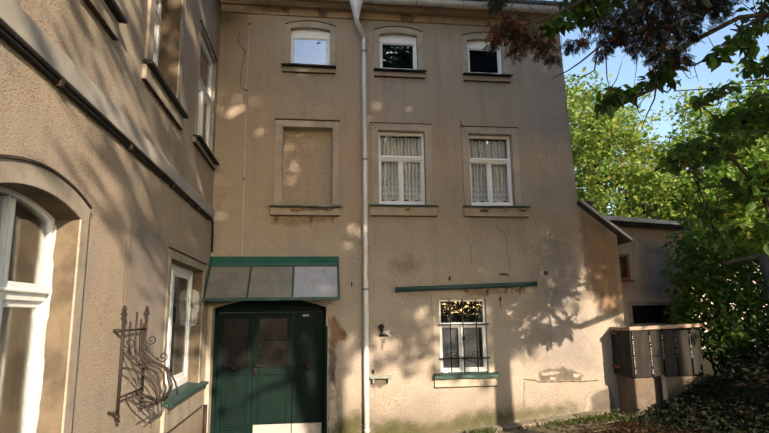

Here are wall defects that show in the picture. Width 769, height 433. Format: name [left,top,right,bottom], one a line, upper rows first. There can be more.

peeling [330,317,347,348]
peeling [540,368,580,380]